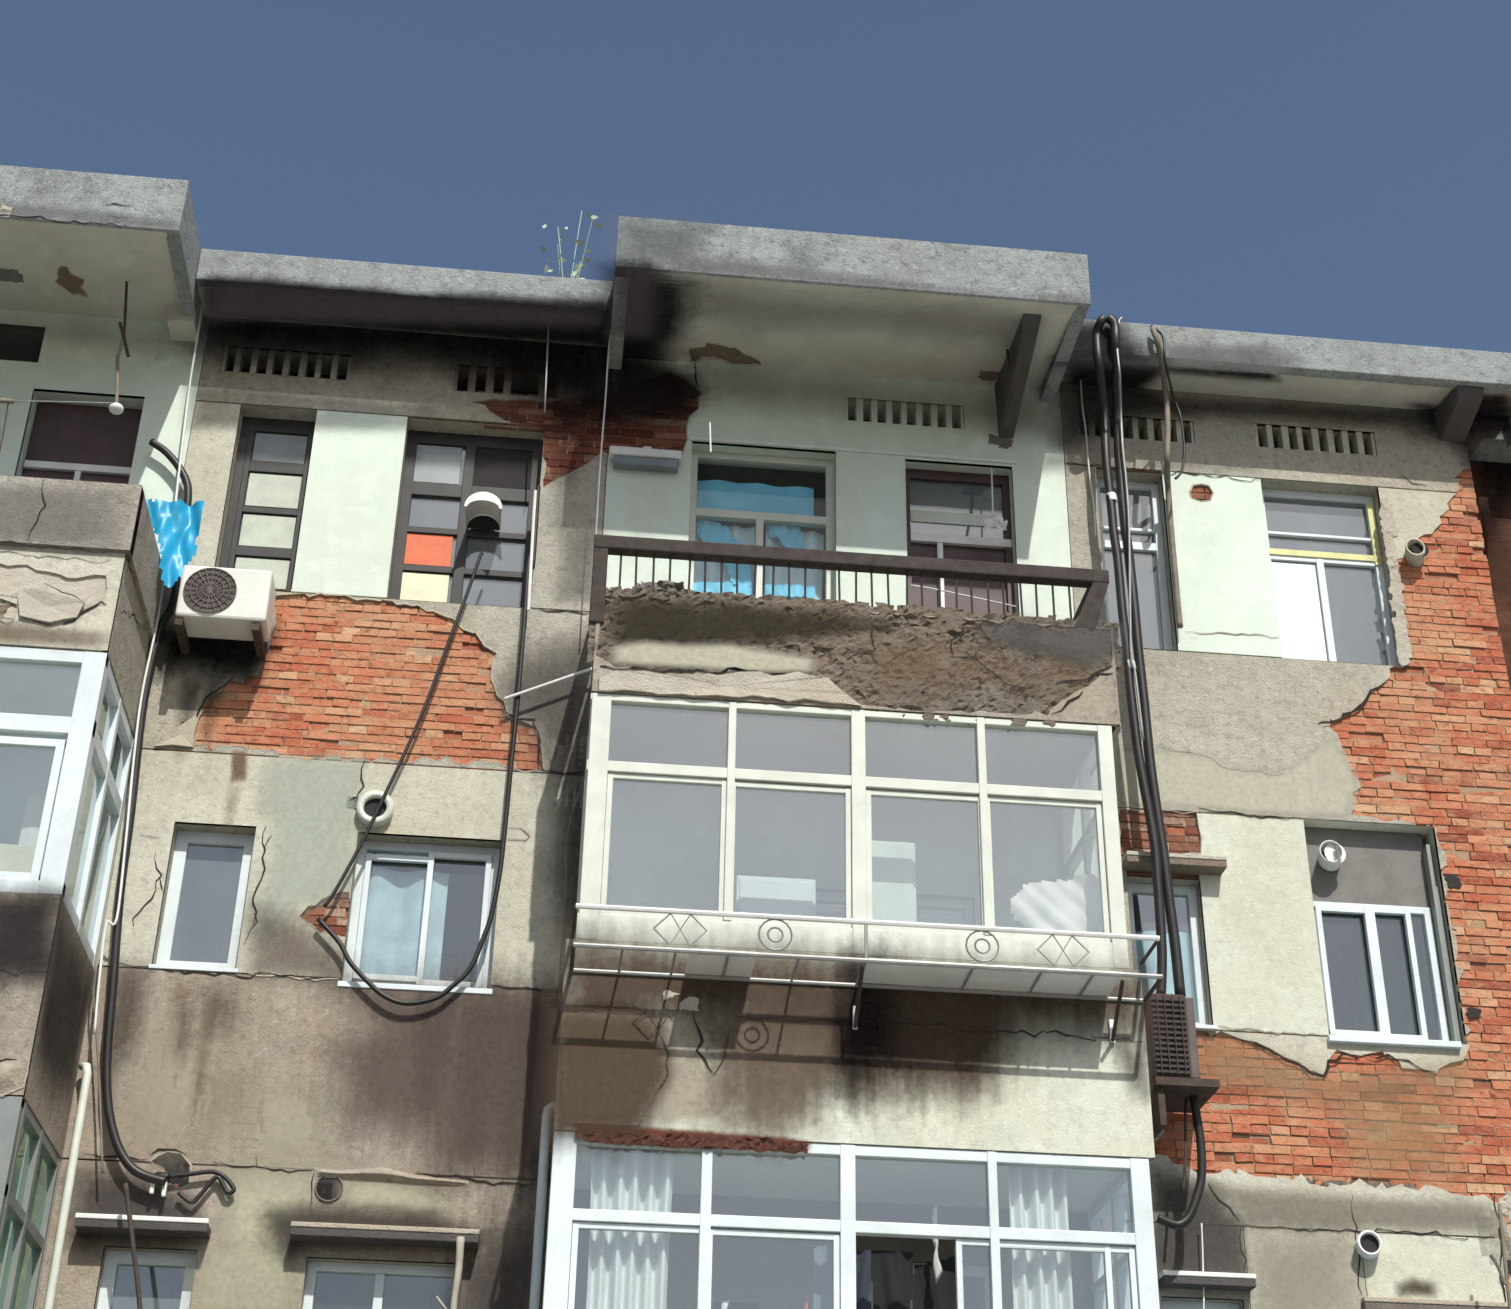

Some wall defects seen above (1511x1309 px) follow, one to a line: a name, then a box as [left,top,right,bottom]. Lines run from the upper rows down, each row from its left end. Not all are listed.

spalling [472,342,762,487]
spalling [0,562,109,627]
crack [0,479,145,630]
spalling [154,591,582,776]
spalling [586,586,1122,726]
crack [120,827,340,981]
spalling [299,890,350,937]
spalling [1118,461,1511,1292]
water stain [152,1048,215,1124]
water stain [348,985,667,1177]
water stain [710,1024,829,1122]
crack [656,1012,1143,1093]